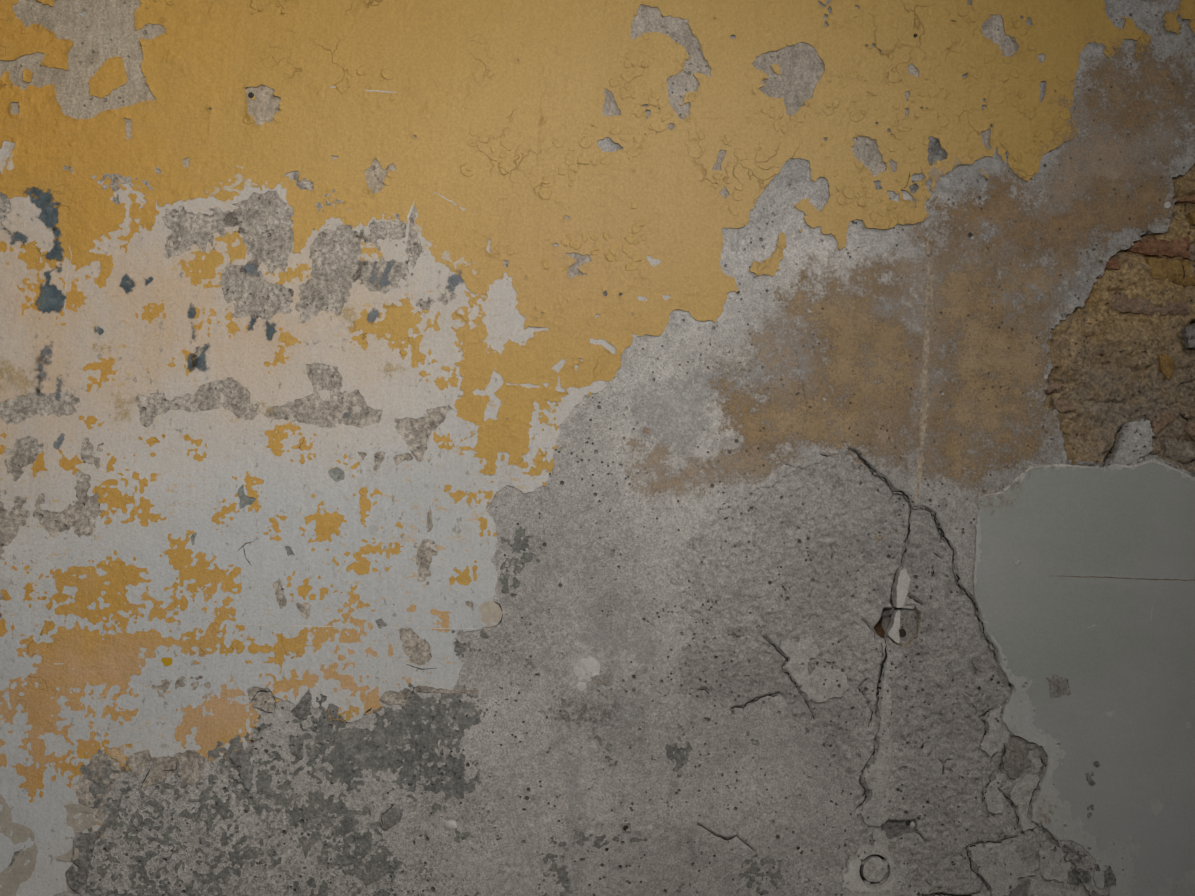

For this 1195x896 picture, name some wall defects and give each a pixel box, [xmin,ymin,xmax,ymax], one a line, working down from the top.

peeling [0,0,170,139]
peeling [630,5,711,130]
peeling [752,37,825,120]
peeling [161,165,477,323]
flaking render [1043,164,1195,472]
peeling [0,388,107,560]
peeling [135,362,452,475]
crack [820,448,1000,664]
peeling [57,683,486,896]
crack [700,638,814,719]
crack [857,621,887,808]
crack [930,693,1046,896]